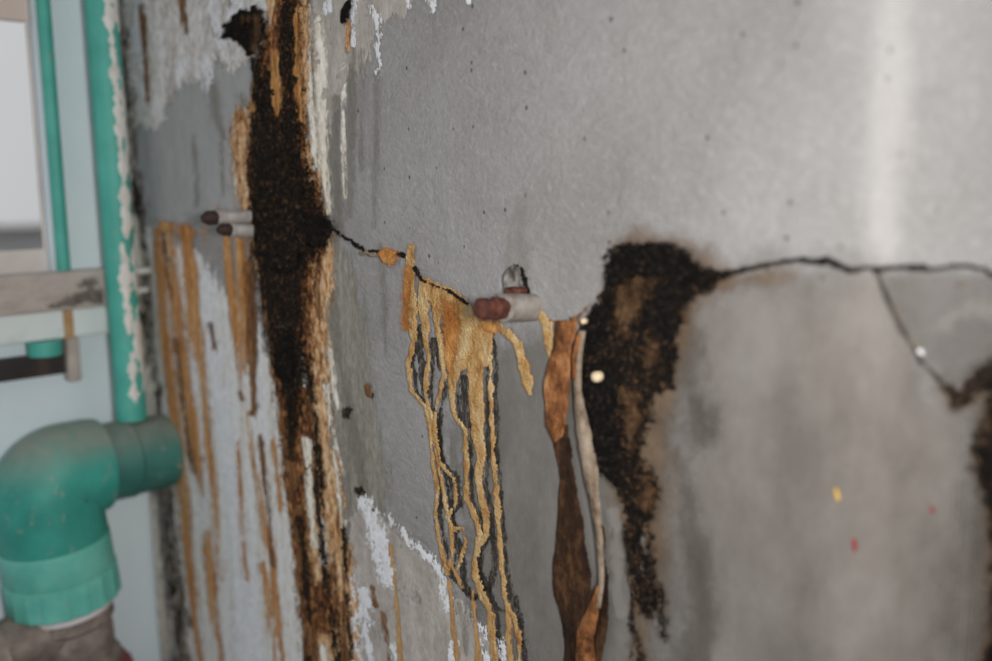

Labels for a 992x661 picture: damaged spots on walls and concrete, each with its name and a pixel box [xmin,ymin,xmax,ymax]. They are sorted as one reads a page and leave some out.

water stain [312,15,348,215]
peeling [310,0,437,139]
water stain [130,170,146,233]
crack [334,230,469,306]
crack [716,256,992,394]
rust [151,222,225,661]
water stain [455,240,992,661]
peeling [346,493,517,661]